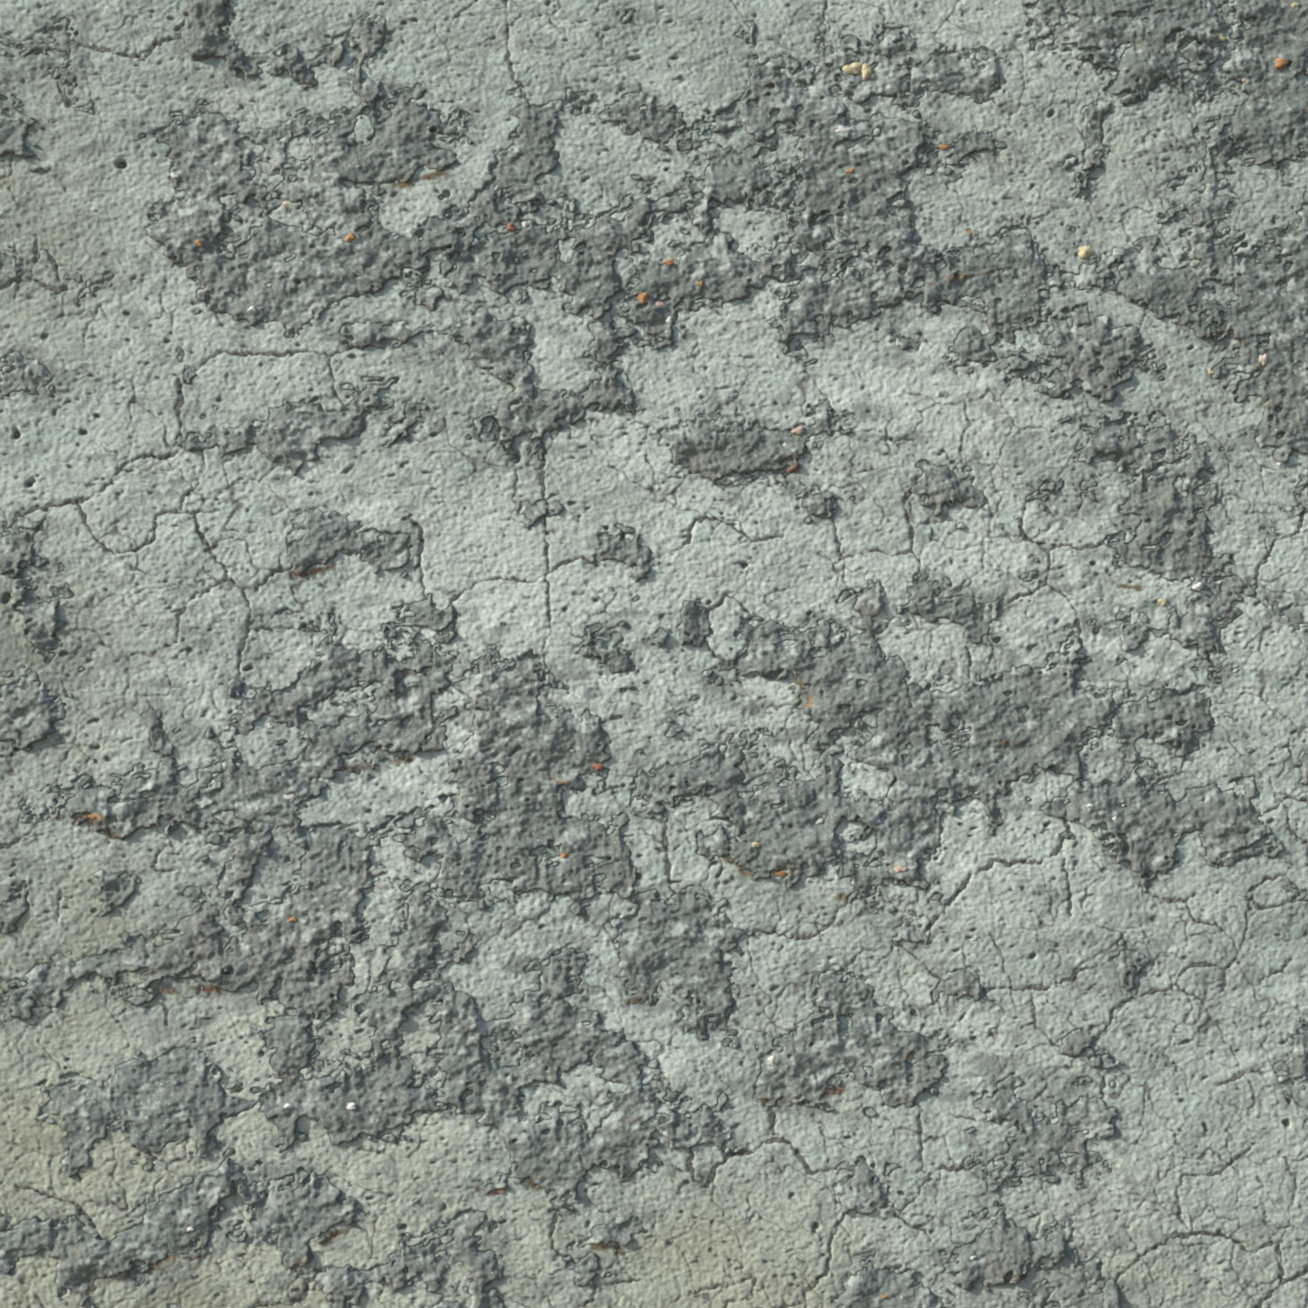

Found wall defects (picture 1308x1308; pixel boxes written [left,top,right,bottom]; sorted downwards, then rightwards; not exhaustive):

spalling [140,0,1308,476]
crack [8,347,353,680]
crack [406,438,596,660]
spalling [0,400,1308,1308]
crack [841,819,1114,1047]
crack [1095,796,1308,1099]
crack [16,1174,102,1240]
crack [251,1270,323,1308]
crack [687,1106,837,1188]
crack [690,1214,845,1308]
crack [888,1103,994,1245]
crack [1115,1147,1308,1308]